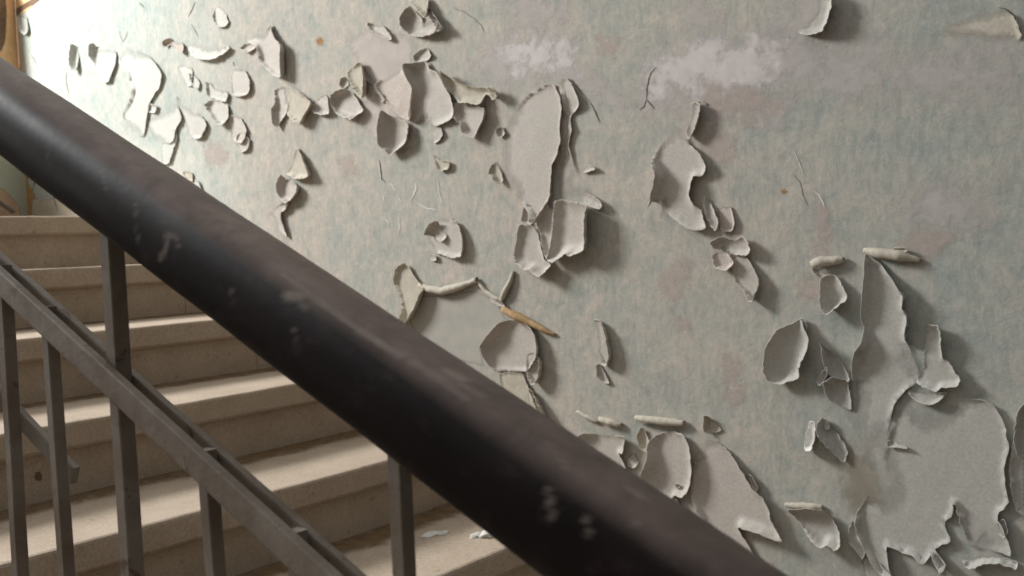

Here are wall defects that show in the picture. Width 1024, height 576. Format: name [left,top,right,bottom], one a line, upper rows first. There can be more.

peeling [66,0,498,172]
crack [640,67,657,110]
peeling [799,0,832,35]
peeling [947,7,1023,40]
peeling [183,171,202,189]
peeling [272,147,311,237]
peeling [393,77,602,415]
peeling [646,100,760,302]
peeling [576,410,783,552]
peeling [762,247,1024,576]